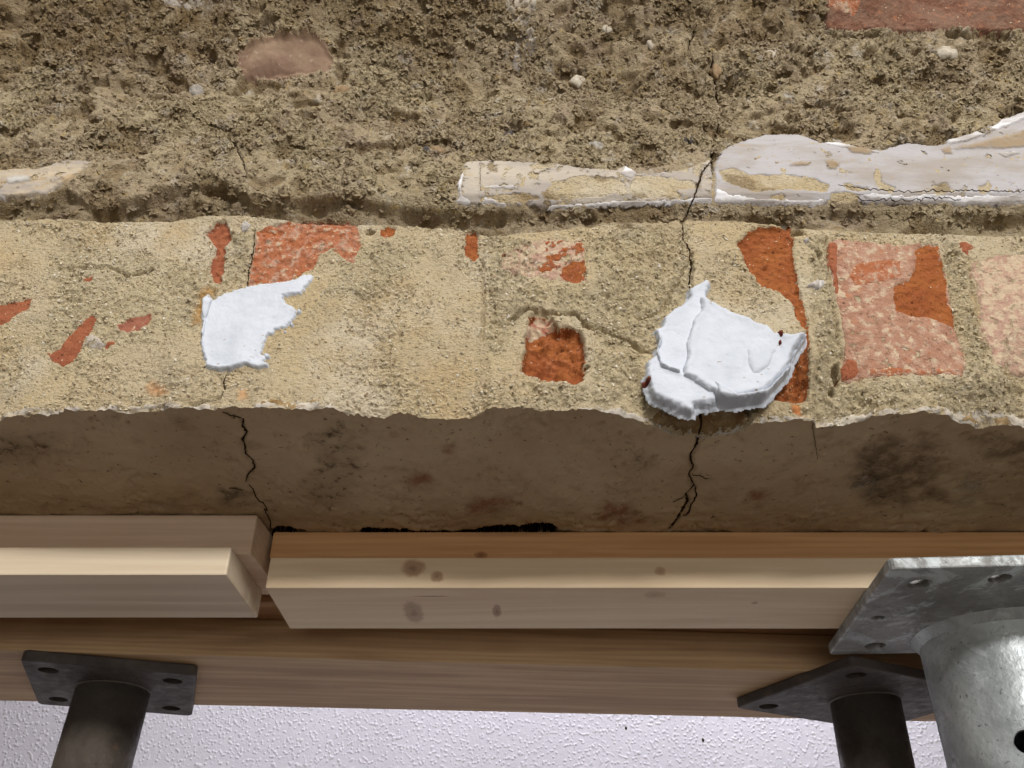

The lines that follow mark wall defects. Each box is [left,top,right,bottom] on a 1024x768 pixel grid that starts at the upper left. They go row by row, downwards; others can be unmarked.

crack [677,9,719,289]
peeling [454,112,1024,211]
damp [196,290,214,322]
crack [247,233,255,287]
spalling [249,221,361,286]
spalling [521,317,586,385]
spalling [737,227,811,404]
peeling [826,239,966,387]
crack [195,374,271,529]
crack [669,413,707,529]